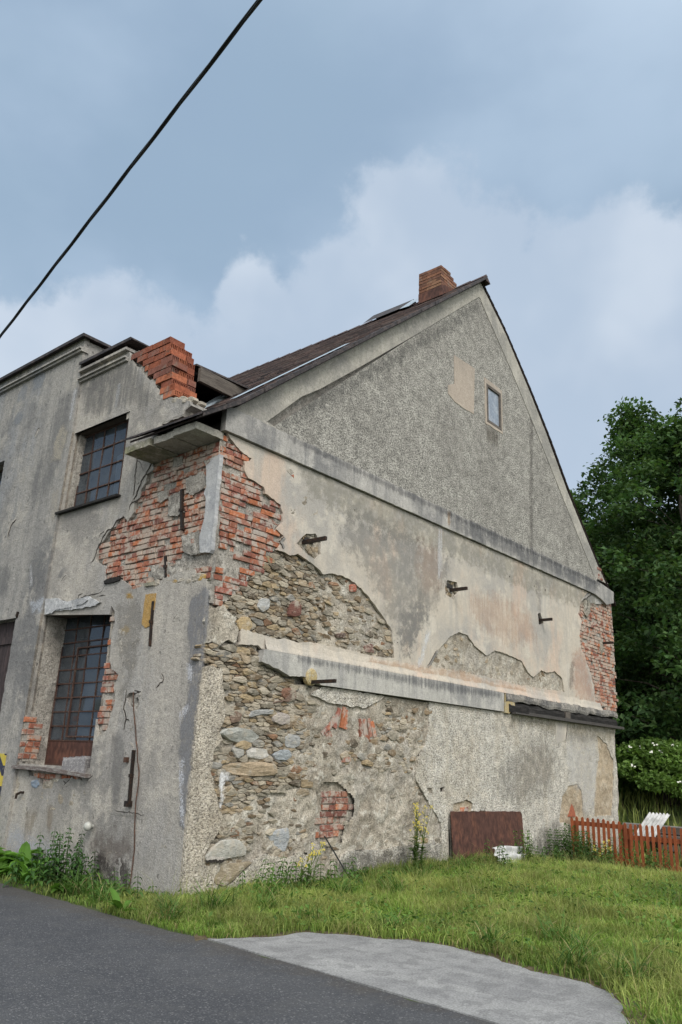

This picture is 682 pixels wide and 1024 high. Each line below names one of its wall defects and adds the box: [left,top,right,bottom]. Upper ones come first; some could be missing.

peeling [45,596,102,615]
spalling [97,435,484,889]
spalling [429,633,563,691]
spalling [578,591,618,712]
spalling [14,711,82,800]
peeling [559,736,613,824]